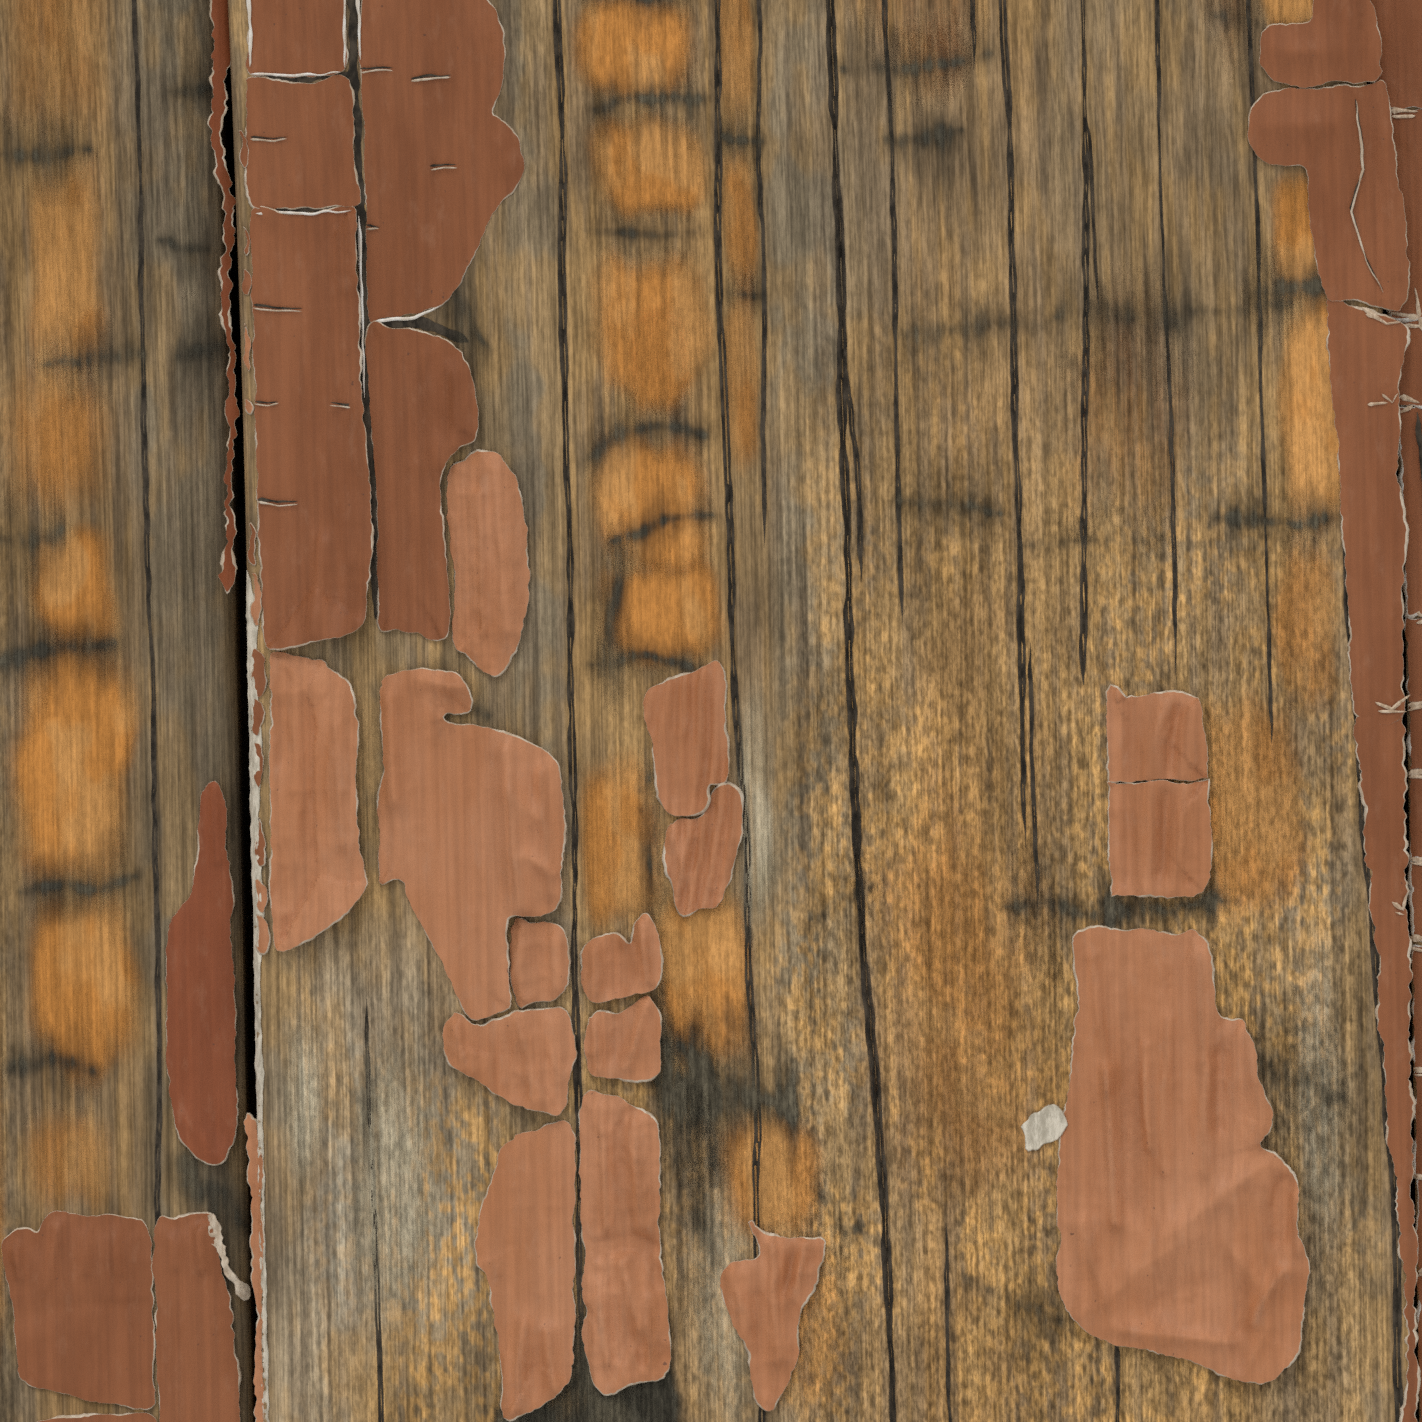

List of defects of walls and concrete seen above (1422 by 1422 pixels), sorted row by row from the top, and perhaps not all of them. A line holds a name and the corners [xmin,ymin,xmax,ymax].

peeling [1,0,671,1422]
peeling [643,660,744,917]
crack [714,0,767,1259]
crack [826,0,904,1422]
crack [970,0,1040,910]
crack [1079,0,1099,685]
peeling [1105,684,1213,899]
peeling [1247,0,1422,1422]
crack [758,1407,766,1422]
peeling [720,1220,826,1411]
peeling [1021,925,1311,1385]